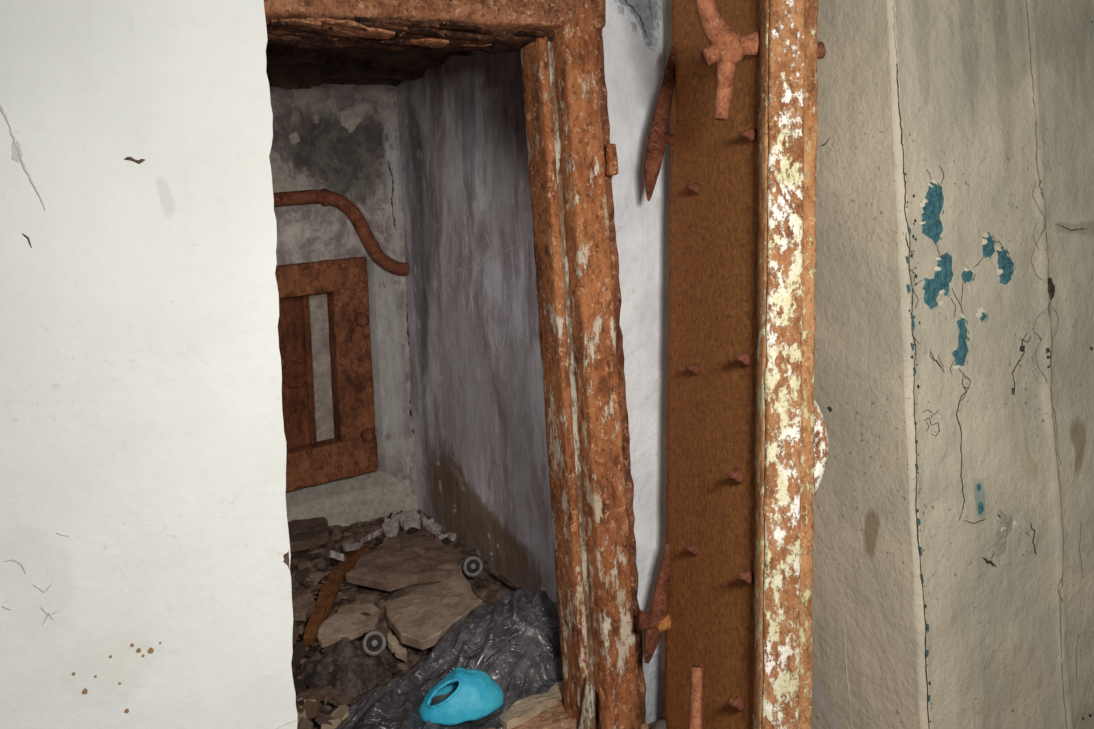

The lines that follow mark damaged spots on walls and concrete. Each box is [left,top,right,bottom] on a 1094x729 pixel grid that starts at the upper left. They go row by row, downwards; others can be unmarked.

rust [266,17,503,49]
crack [0,104,45,209]
crack [897,66,987,729]
peeling [914,165,1016,374]
crack [1012,0,1083,729]